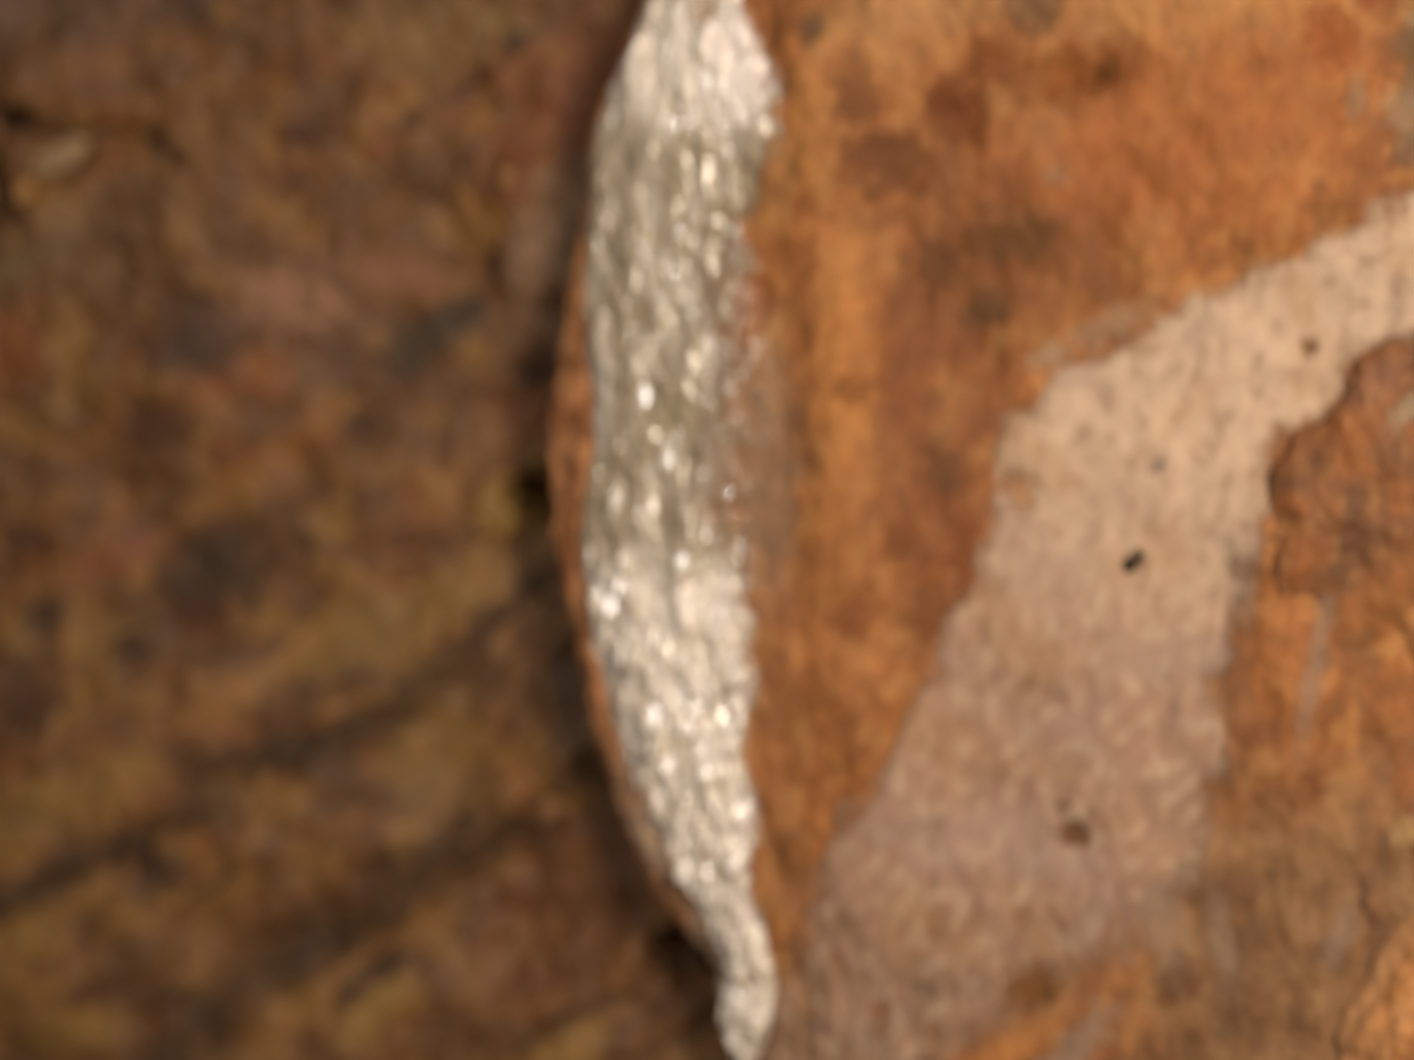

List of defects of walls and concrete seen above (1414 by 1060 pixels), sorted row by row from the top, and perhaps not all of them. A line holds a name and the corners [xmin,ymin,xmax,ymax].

spalling [1123,550,1143,572]